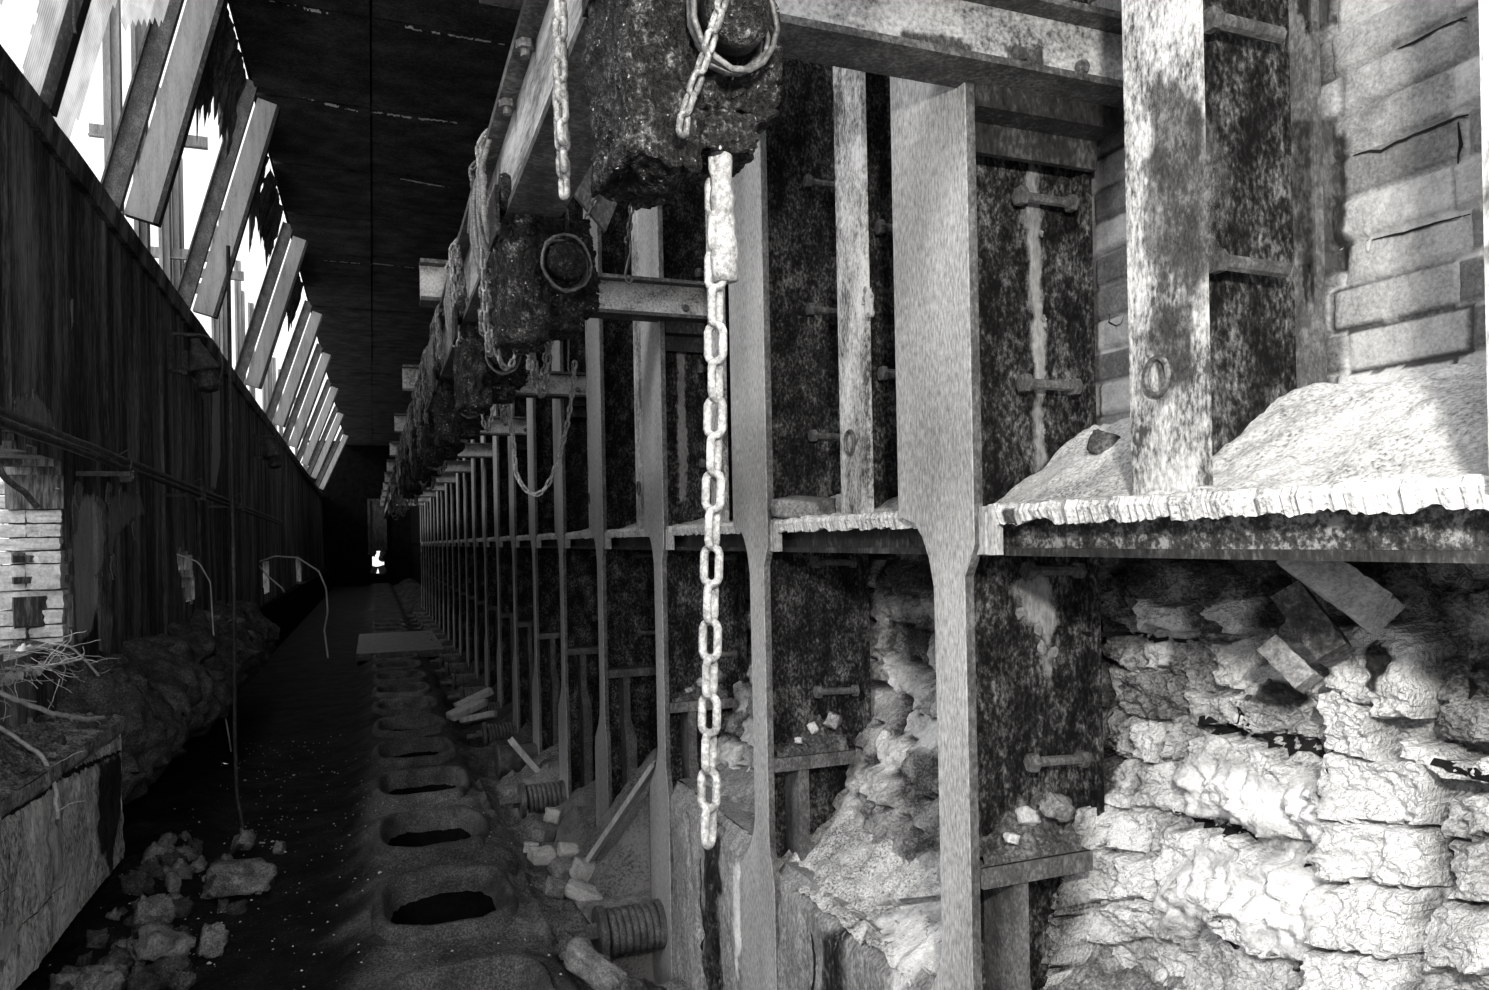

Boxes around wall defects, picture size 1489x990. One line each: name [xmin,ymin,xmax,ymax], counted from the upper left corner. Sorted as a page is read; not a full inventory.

crack [1397,16,1467,49]
crack [1353,114,1469,164]
damp [98,753,122,875]
crack [698,858,706,981]
crack [809,933,817,990]